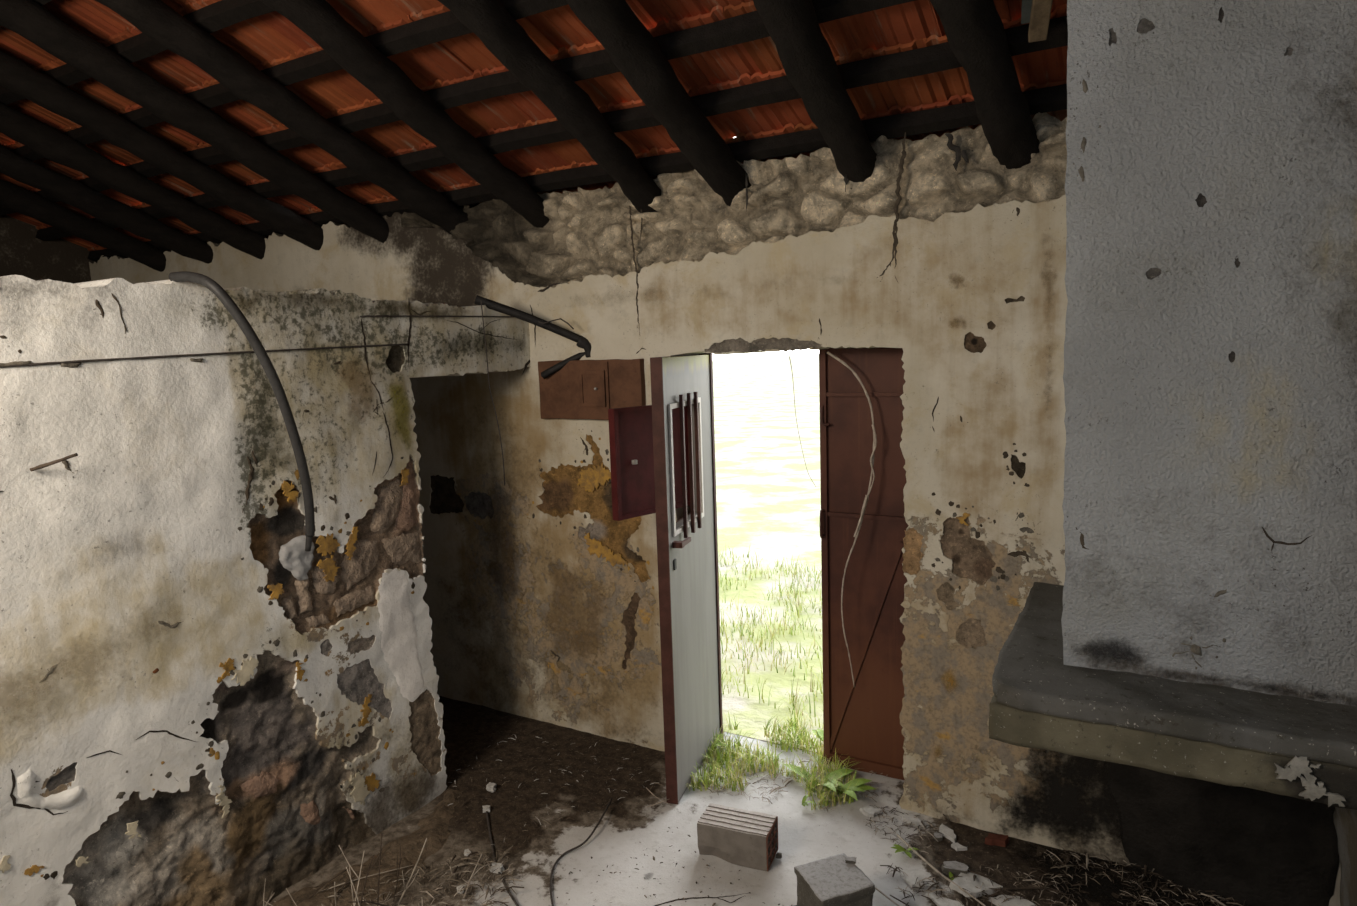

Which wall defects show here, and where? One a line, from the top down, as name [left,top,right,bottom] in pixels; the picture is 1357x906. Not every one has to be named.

flaking render [401,112,1067,288]
water stain [242,451,261,513]
spalling [532,430,654,670]
spalling [902,492,1016,649]
spalling [0,456,494,906]
peeling [1274,756,1346,807]